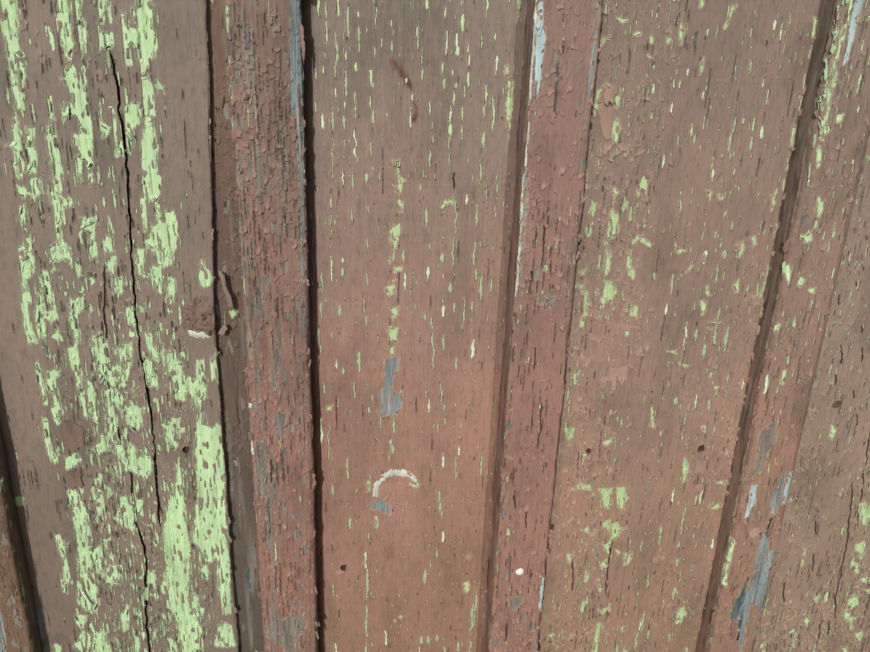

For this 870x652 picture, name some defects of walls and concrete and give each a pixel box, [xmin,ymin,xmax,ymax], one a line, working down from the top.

peeling [288,0,309,287]
peeling [315,0,360,188]
peeling [442,0,470,166]
peeling [514,0,546,297]
peeling [806,0,870,187]
crack [102,52,163,652]
peeling [35,296,254,652]
peeling [199,260,234,311]
peeling [356,307,420,540]
peeling [563,188,632,342]
peeling [729,471,793,651]
peeling [756,222,831,336]